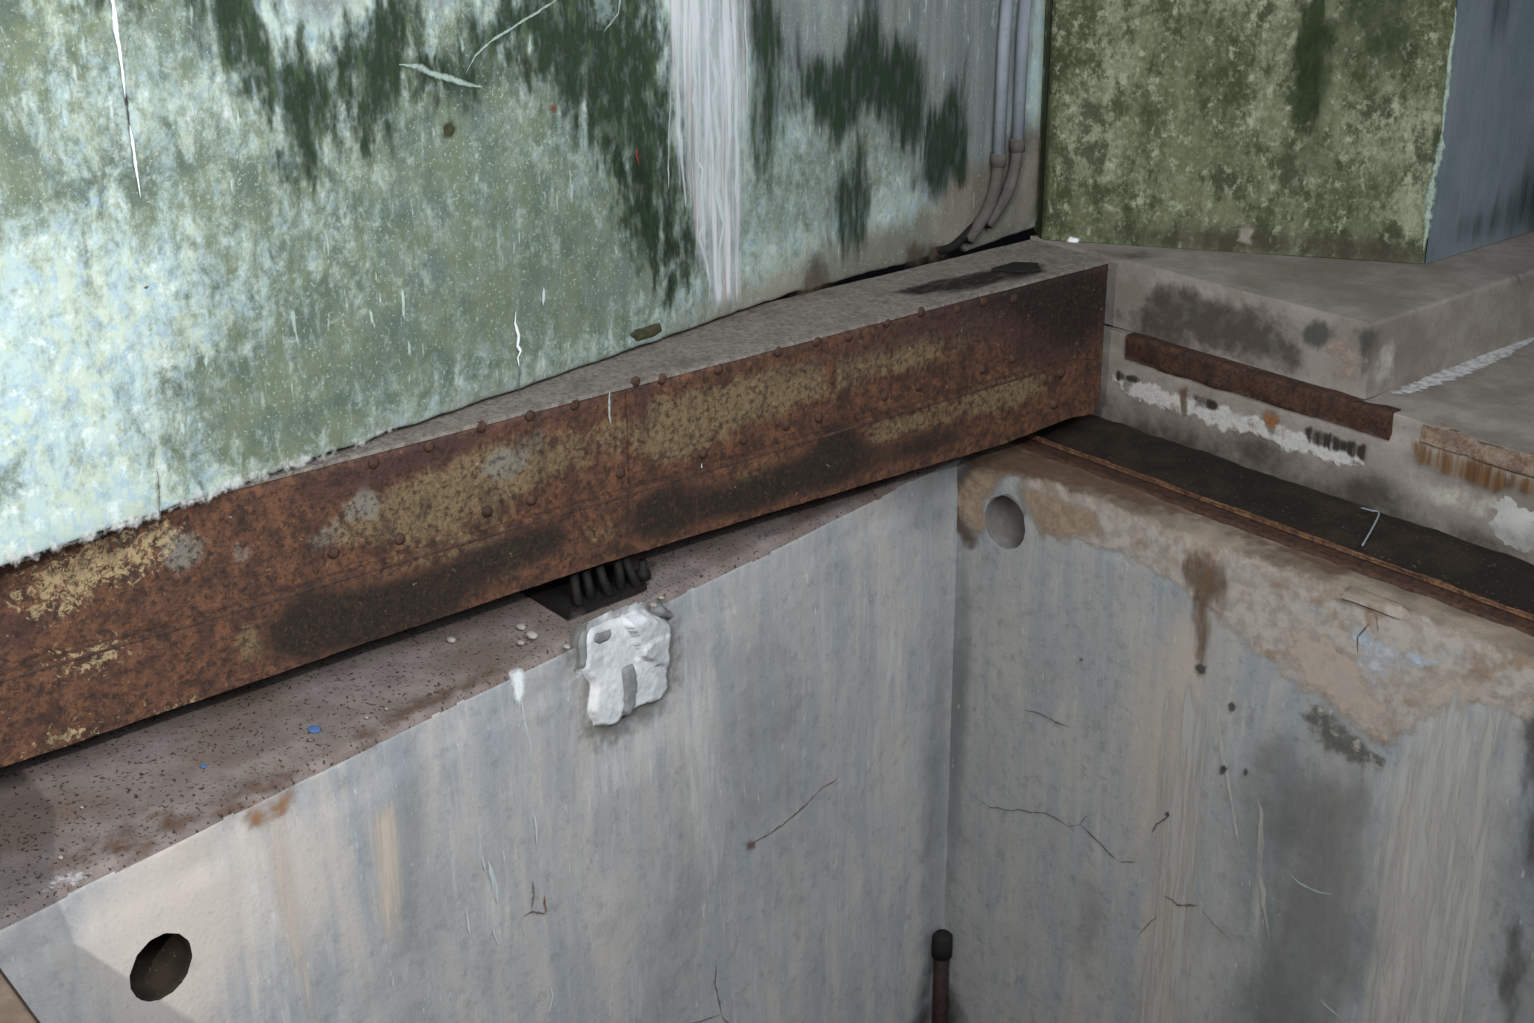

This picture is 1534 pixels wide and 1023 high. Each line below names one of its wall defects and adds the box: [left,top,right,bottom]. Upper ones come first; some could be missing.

damp [338,0,444,158]
damp [125,92,141,197]
damp [668,0,748,304]
damp [604,140,688,307]
corrosion [991,262,1040,272]
corrosion [1125,332,1401,440]
corrosion [977,447,1183,514]
corrosion [1183,559,1226,658]
spalling [0,414,1534,1023]
crack [748,778,838,848]
crack [975,798,1133,863]
crack [693,967,728,1023]